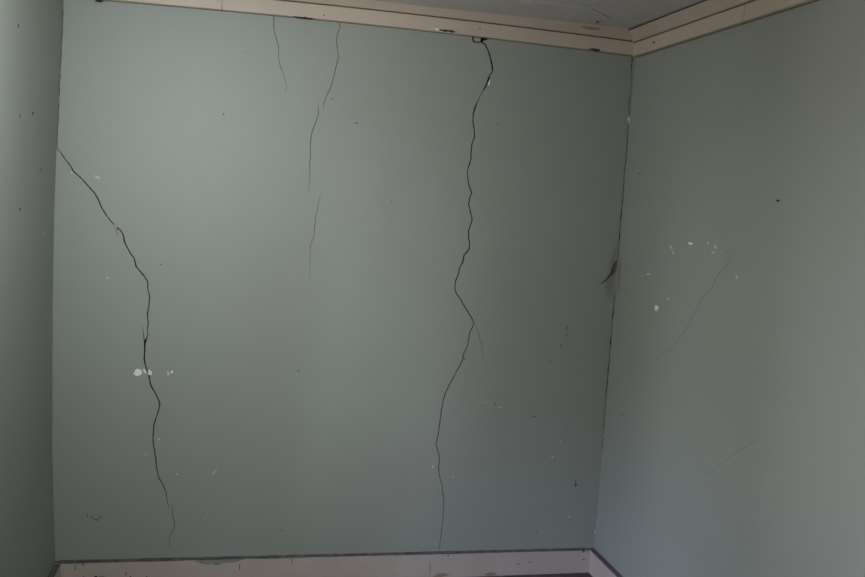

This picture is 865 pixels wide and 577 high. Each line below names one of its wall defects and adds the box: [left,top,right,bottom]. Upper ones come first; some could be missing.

crack [57,1,175,548]
crack [308,24,341,250]
crack [436,42,493,549]